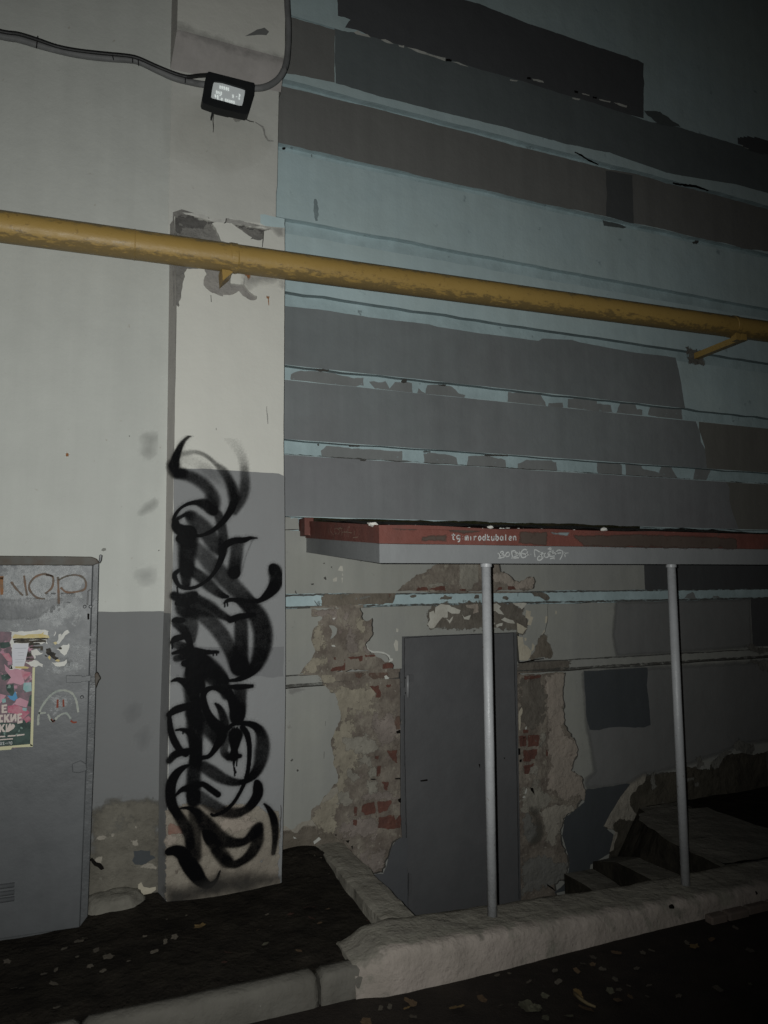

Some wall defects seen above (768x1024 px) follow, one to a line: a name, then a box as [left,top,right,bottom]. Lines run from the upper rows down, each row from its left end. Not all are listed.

flaking render [173,209,265,241]
flaking render [172,265,256,307]
flaking render [88,563,585,902]
flaking render [604,739,768,858]